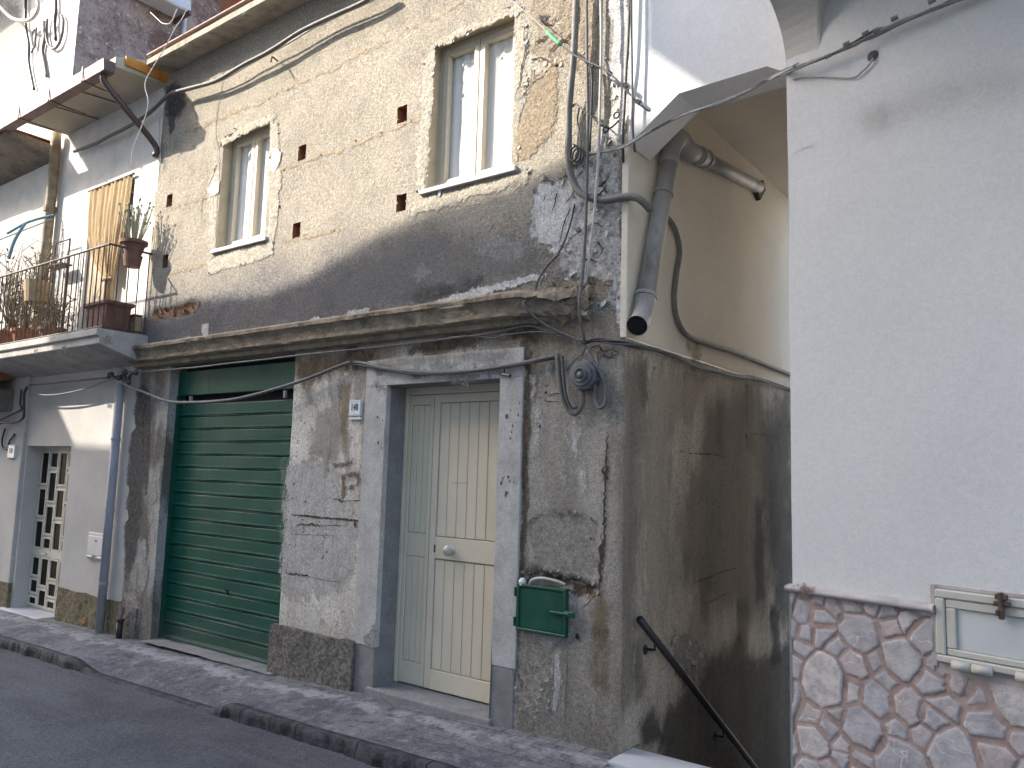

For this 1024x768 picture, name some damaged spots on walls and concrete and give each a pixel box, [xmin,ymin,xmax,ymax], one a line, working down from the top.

flaking render [152,298,200,323]
flaking render [435,0,630,333]
crack [570,432,609,608]
leakage [643,369,792,768]